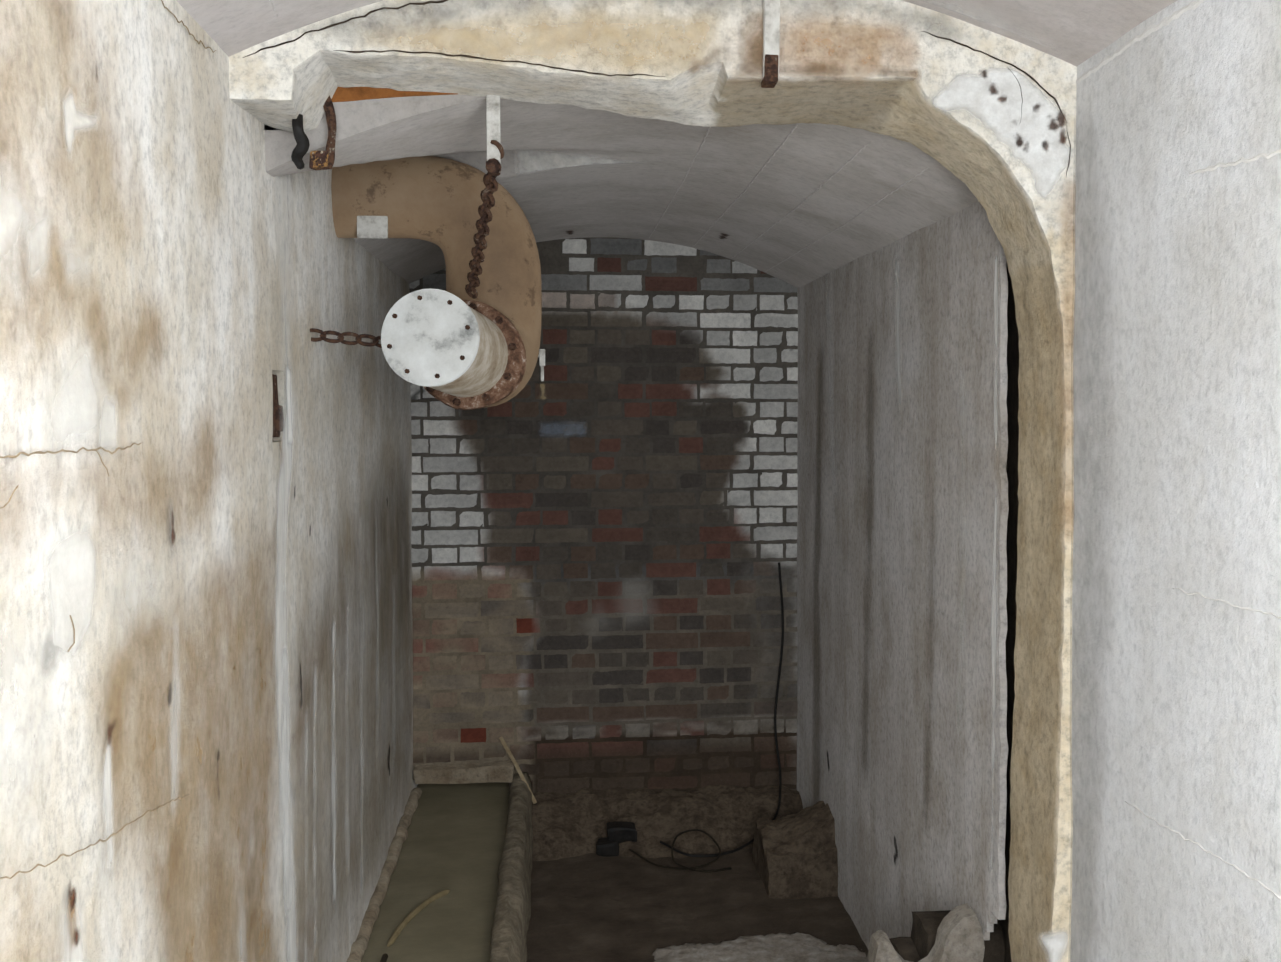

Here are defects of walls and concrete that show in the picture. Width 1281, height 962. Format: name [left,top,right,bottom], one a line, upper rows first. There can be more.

peeling [934,70,1069,196]
crack [0,443,141,508]
leakage [142,370,296,962]
crack [0,794,189,879]
rust [69,890,79,945]